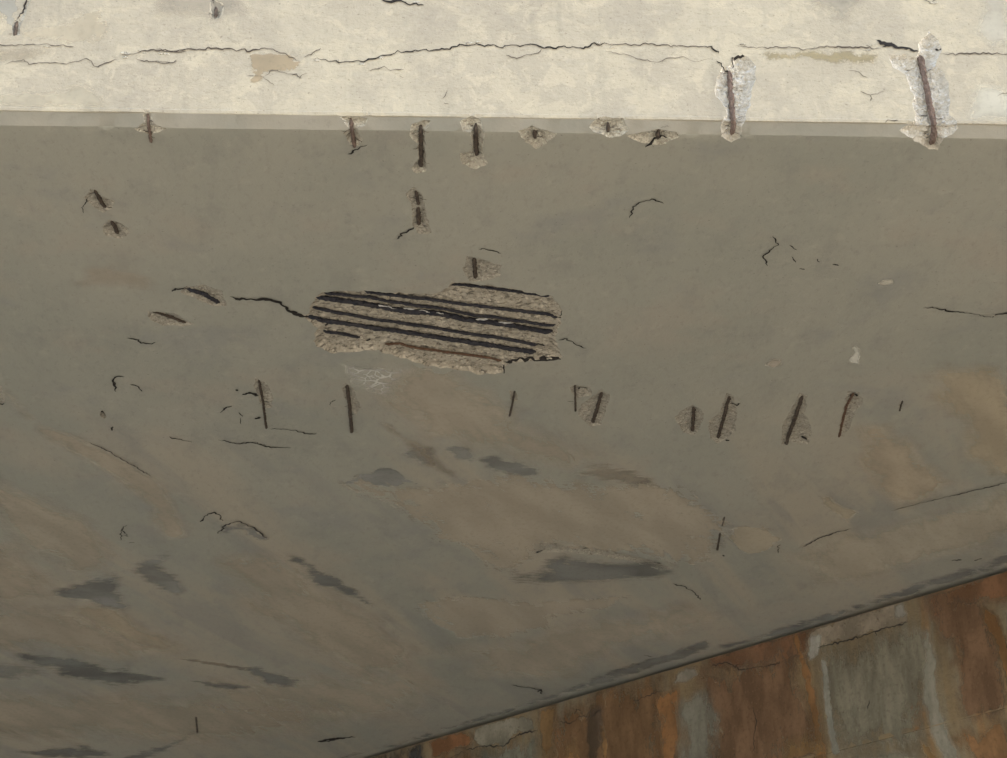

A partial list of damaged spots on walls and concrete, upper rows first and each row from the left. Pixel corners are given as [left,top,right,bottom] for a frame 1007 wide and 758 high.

crack [383,0,423,8]
crack [0,41,714,85]
spalling [711,46,756,142]
spalling [877,31,958,150]
spalling [460,115,488,169]
crack [230,296,308,318]
spalling [304,256,583,375]
water stain [57,577,125,608]
water stain [292,558,367,604]
corrosion [928,572,1007,677]
water stain [183,659,297,685]
corrosion [700,631,826,758]